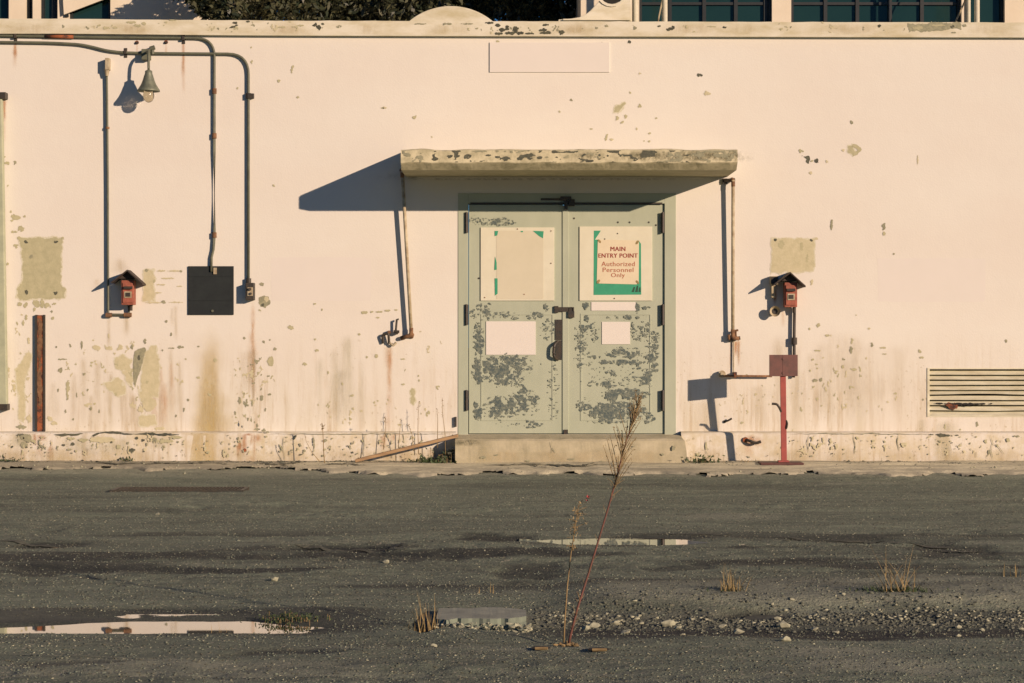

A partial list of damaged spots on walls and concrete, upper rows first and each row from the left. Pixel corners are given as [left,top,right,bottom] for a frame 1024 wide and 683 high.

peeling [613,91,642,123]
spalling [402,127,737,162]
peeling [842,144,862,157]
peeling [469,217,516,226]
peeling [770,237,818,285]
peeling [3,210,250,459]
peeling [470,303,560,428]
peeling [575,302,659,424]
peeling [234,339,423,458]
peeling [789,422,1024,458]